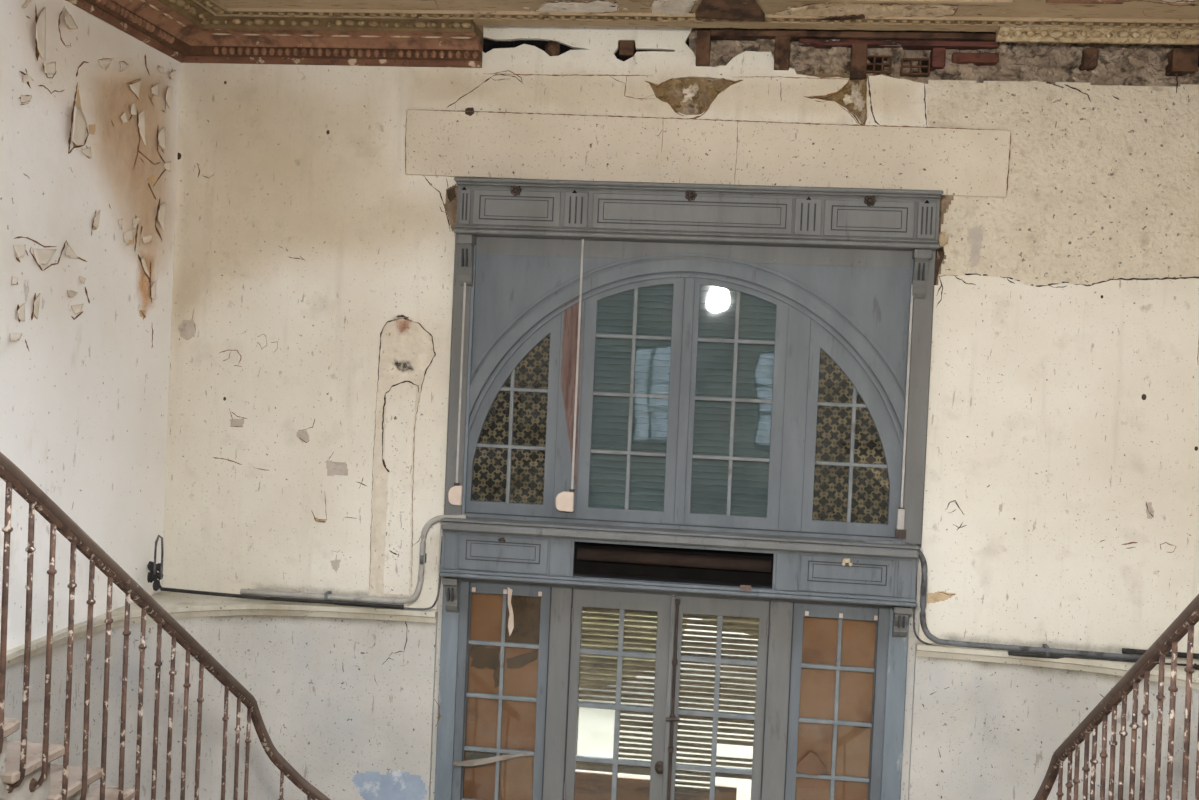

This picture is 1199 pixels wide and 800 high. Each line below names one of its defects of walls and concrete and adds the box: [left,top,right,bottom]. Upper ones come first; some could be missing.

peeling [524,0,628,13]
peeling [651,0,698,15]
peeling [774,3,959,17]
spalling [483,38,581,56]
spalling [615,38,689,61]
spalling [645,78,743,119]
spalling [809,83,867,125]
crack [1050,83,1119,102]
crack [405,70,1011,230]
peeling [67,55,176,320]
crack [936,274,1199,307]
crack [347,315,436,590]